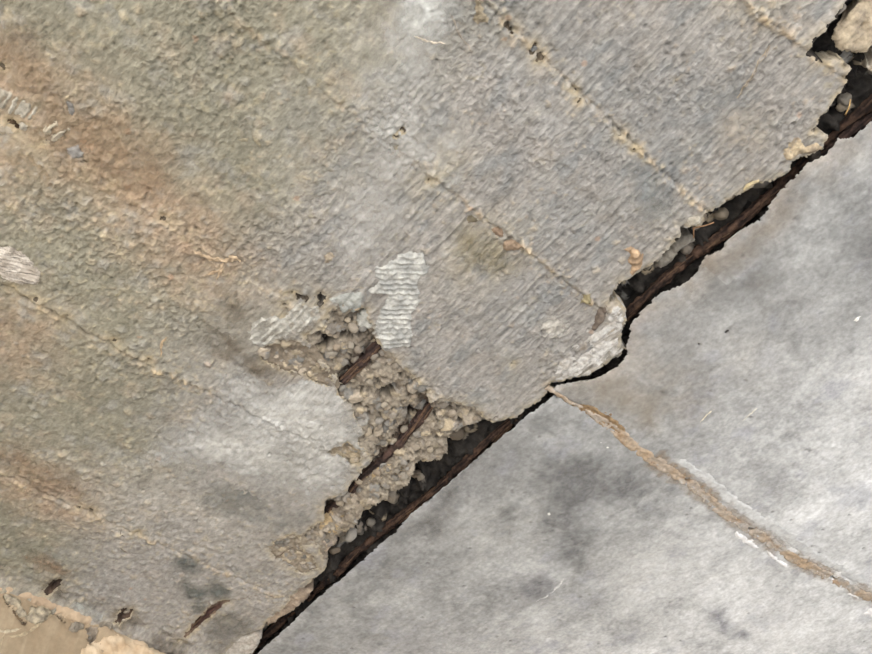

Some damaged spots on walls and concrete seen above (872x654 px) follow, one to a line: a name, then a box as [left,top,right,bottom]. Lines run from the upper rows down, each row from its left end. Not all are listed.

crack [811,0,872,138]
spalling [834,49,872,76]
spalling [624,94,872,326]
spalling [225,291,525,654]
crack [234,157,801,654]
hole [42,579,62,595]
flaking render [81,608,155,654]
spalling [183,600,230,638]